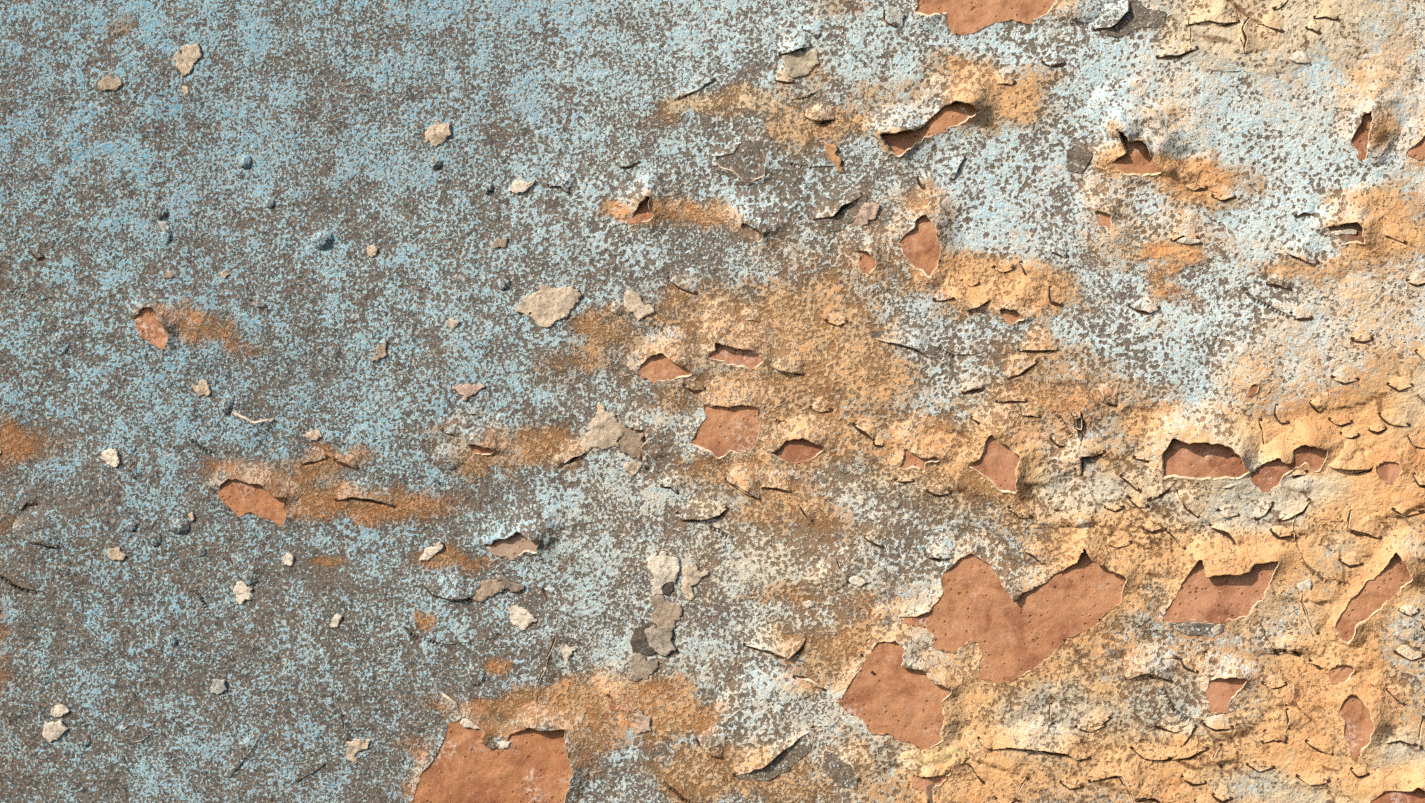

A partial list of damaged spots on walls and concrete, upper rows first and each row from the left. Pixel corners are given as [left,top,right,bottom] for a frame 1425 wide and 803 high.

peeling [886,0,1063,45]
peeling [706,61,1010,295]
peeling [1066,77,1218,250]
peeling [120,271,198,357]
peeling [202,457,310,534]
peeling [282,553,294,566]
peeling [619,290,848,471]
peeling [1142,355,1345,499]
peeling [1363,425,1425,493]
peeling [827,518,1312,803]
peeling [1316,516,1425,803]
peeling [402,698,598,803]